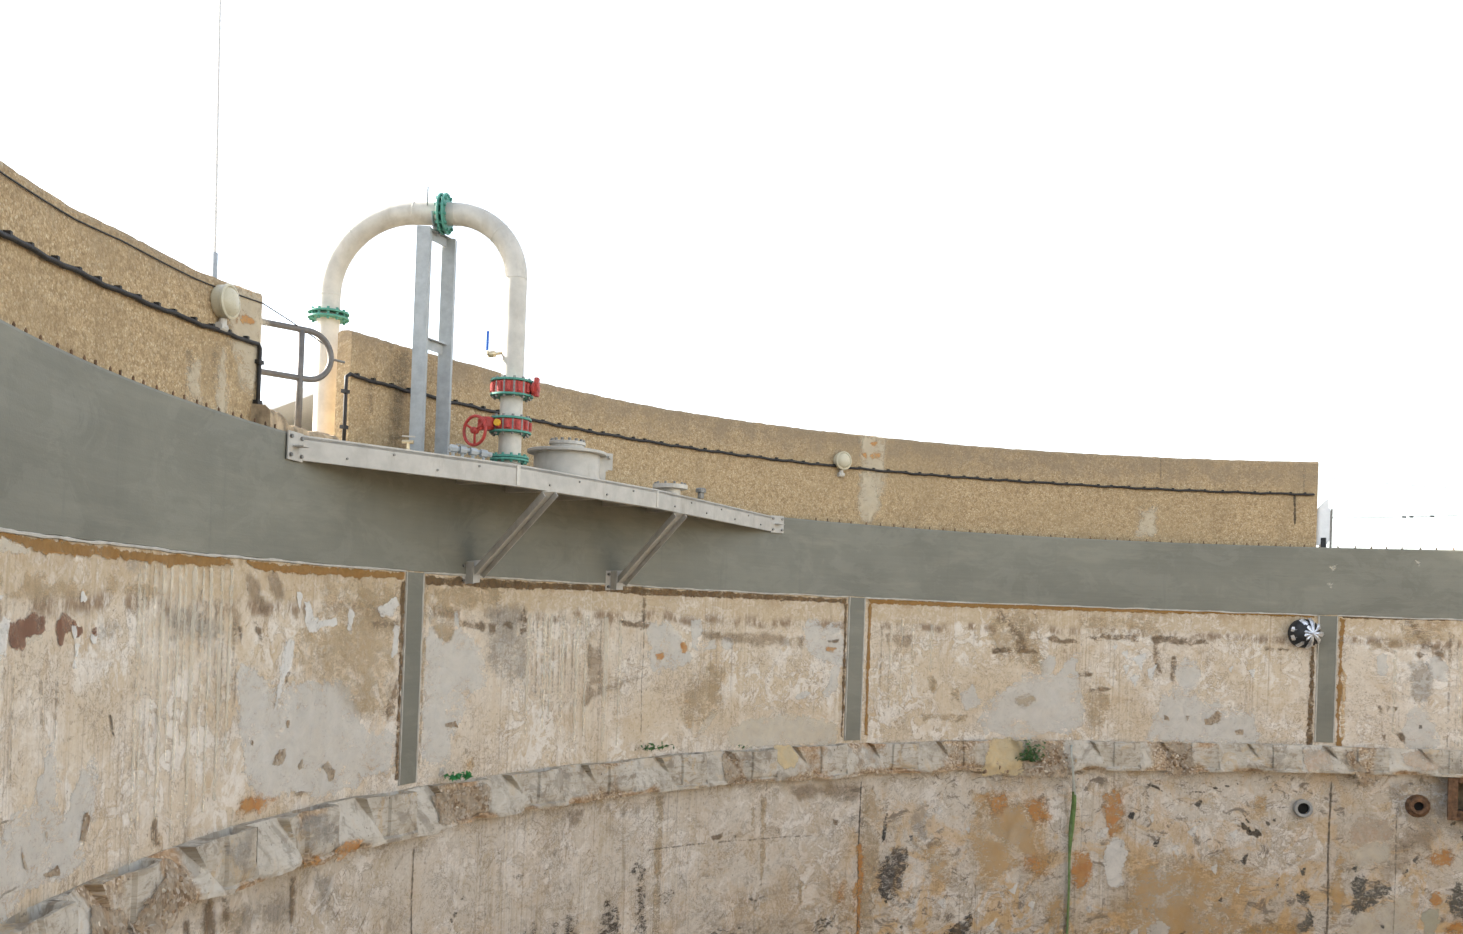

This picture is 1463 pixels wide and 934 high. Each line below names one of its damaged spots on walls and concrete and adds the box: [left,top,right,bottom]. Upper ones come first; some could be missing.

peeling [0,595,98,668]
peeling [297,592,355,634]
peeling [378,597,400,658]
peeling [274,639,294,728]
spalling [273,748,304,770]
leakage [600,844,674,934]
mould [875,813,913,904]
peeling [1097,826,1197,934]
leakage [1296,868,1314,933]
leakage [1350,854,1420,915]
leakage [1421,882,1463,934]